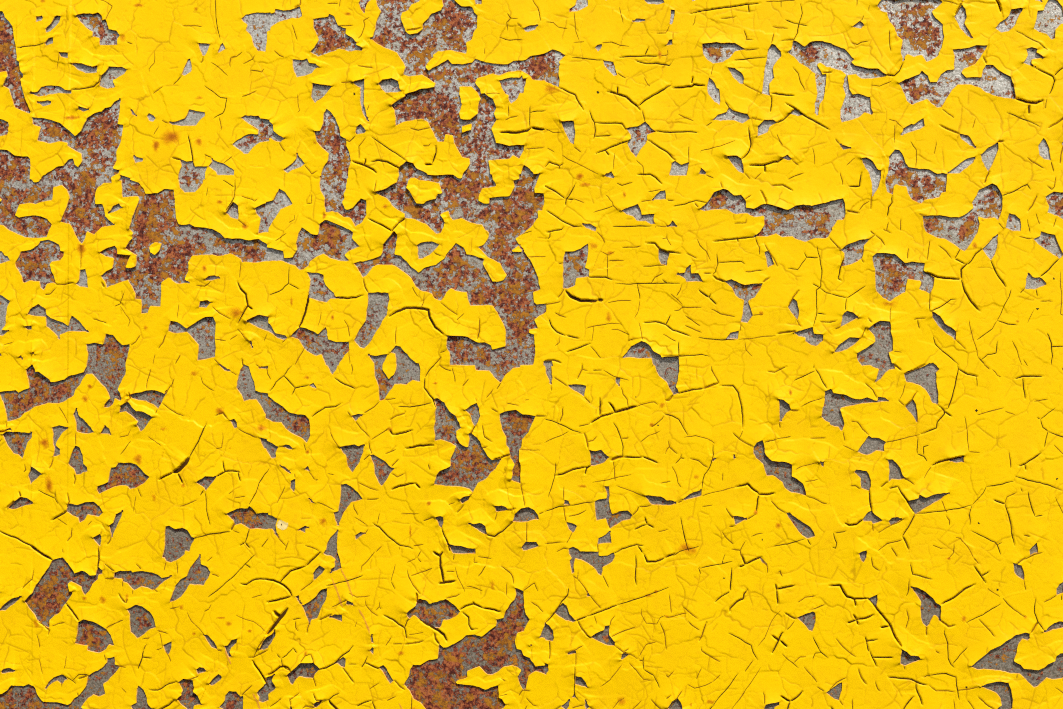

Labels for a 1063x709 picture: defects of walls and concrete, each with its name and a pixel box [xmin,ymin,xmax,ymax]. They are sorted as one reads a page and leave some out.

crack [182,0,301,129]
peeling [0,0,565,491]
crack [159,88,1063,709]
crack [533,0,839,204]
peeling [707,0,1021,173]
peeling [789,235,939,404]
peeling [840,119,1021,260]
crack [985,31,1063,239]
crack [0,459,91,587]
peeling [0,524,210,627]
crack [104,630,198,709]
peeling [370,588,554,709]